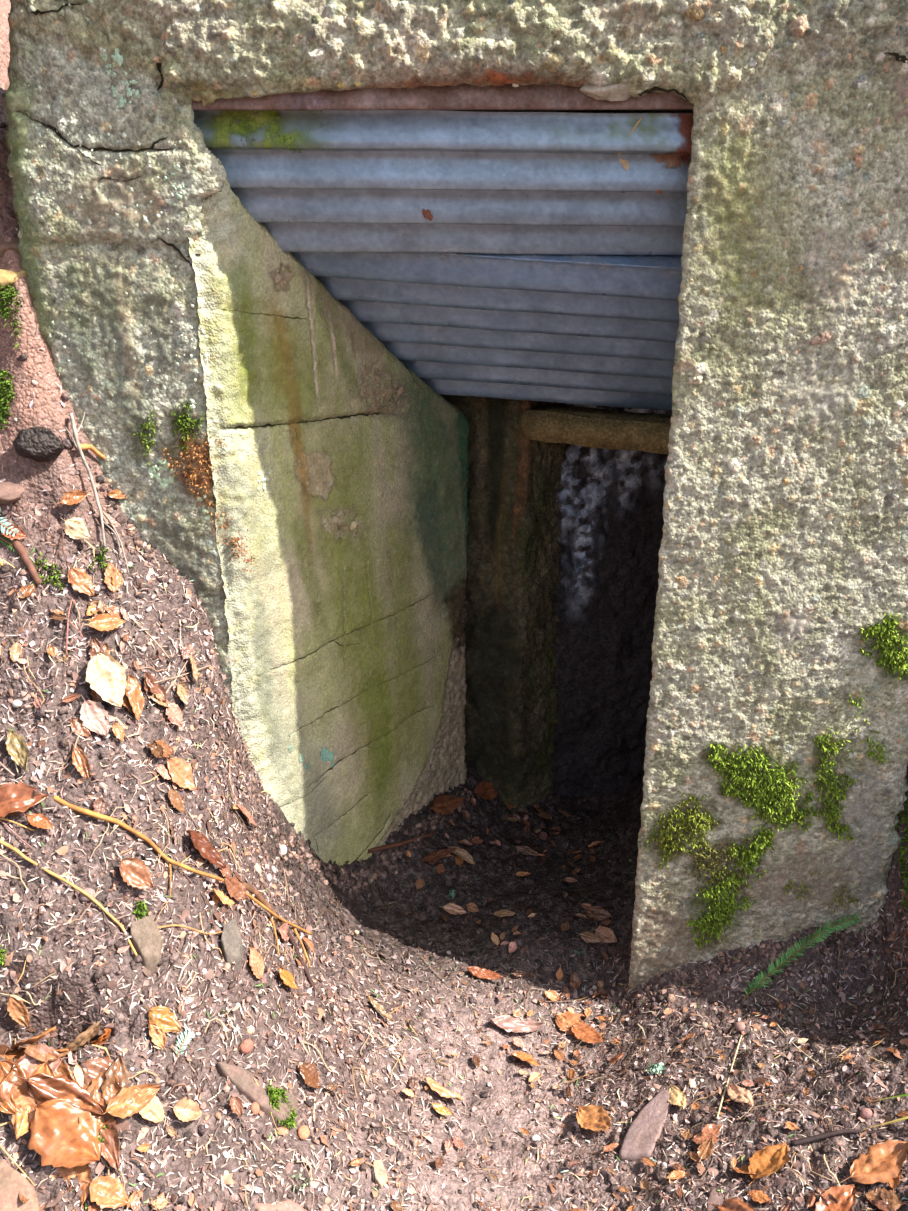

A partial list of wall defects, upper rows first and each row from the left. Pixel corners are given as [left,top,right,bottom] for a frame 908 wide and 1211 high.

rust [371,70,583,88]
crack [884,52,908,63]
crack [18,111,182,182]
rust [652,113,694,168]
crack [225,360,424,442]
damp [406,382,528,786]